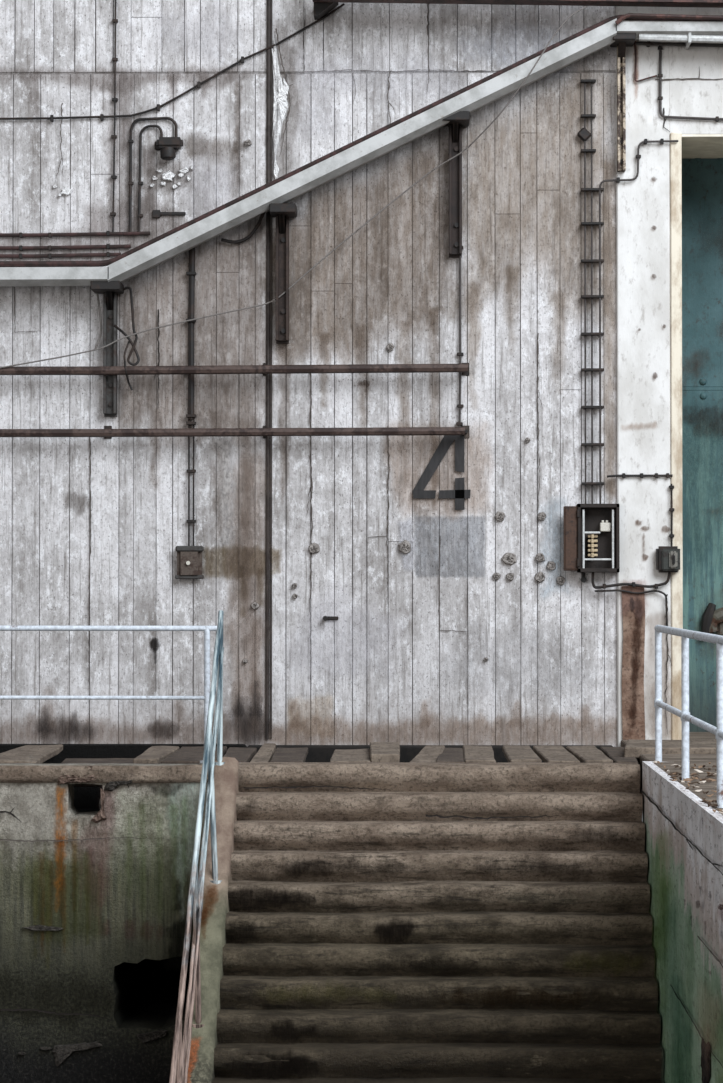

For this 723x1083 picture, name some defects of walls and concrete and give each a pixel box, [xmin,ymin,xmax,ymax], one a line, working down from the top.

peeling [272,36,289,179]
corrosion [54,788,65,898]
leakage [169,782,197,883]
leakage [169,920,191,968]